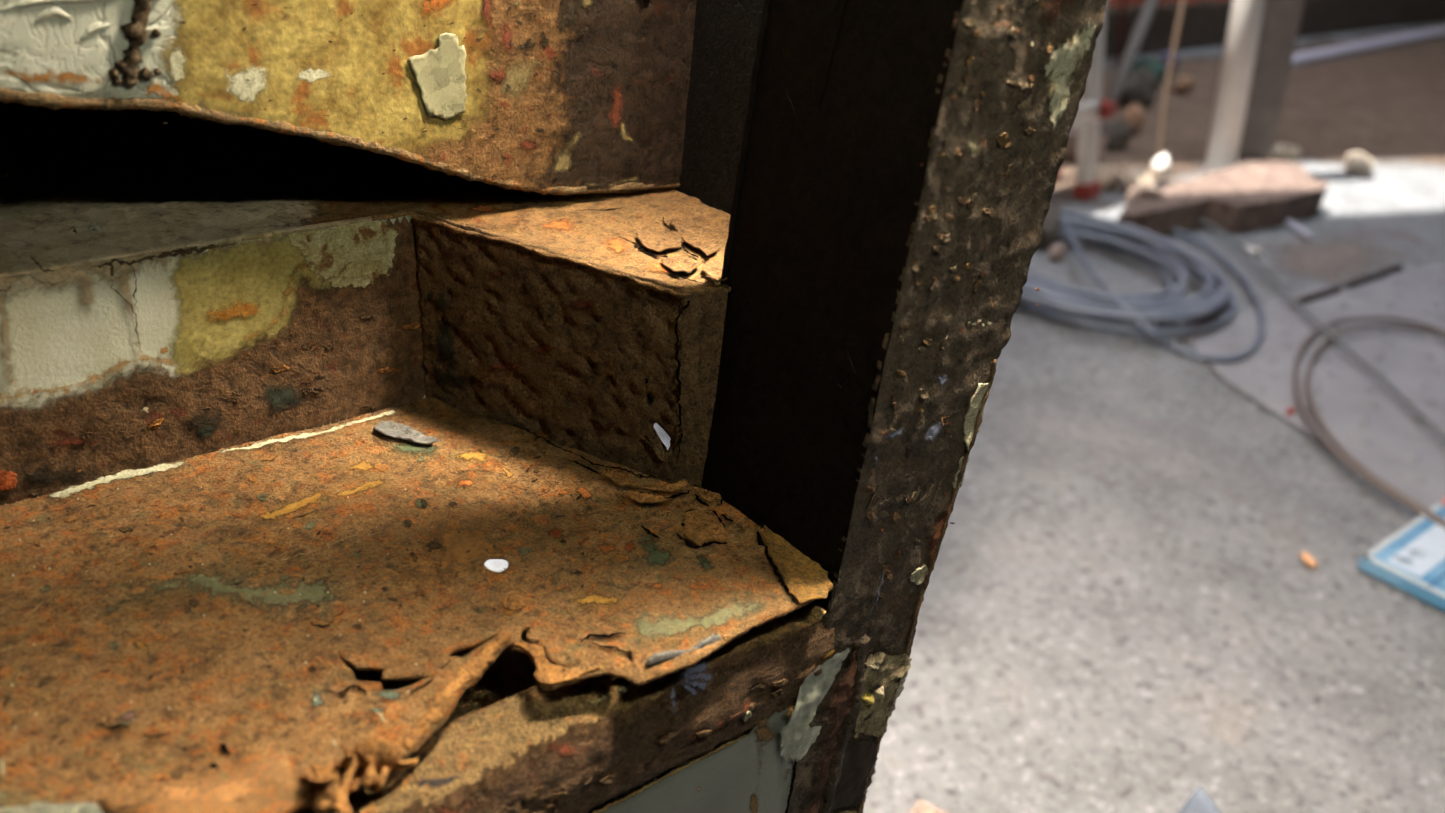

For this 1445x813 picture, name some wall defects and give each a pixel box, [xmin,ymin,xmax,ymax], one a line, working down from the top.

peeling [409,32,468,120]
peeling [1045,21,1096,130]
peeling [555,135,578,171]
peeling [287,220,399,288]
rust [0,0,697,546]
rust [605,218,727,285]
rust [602,467,729,546]
rust [555,584,618,606]
peeling [419,776,459,787]